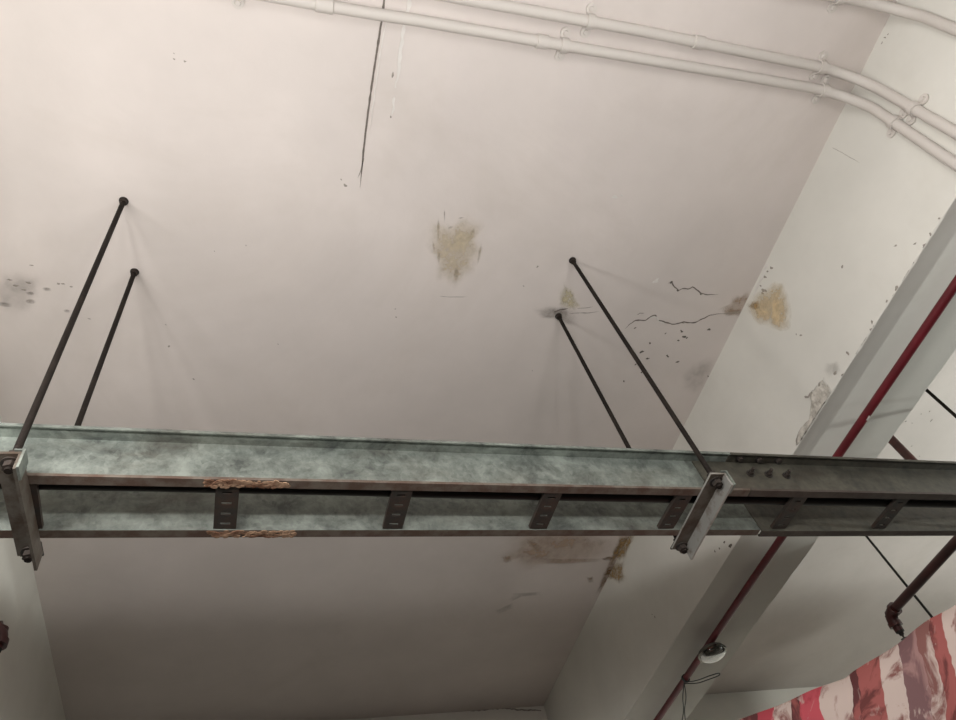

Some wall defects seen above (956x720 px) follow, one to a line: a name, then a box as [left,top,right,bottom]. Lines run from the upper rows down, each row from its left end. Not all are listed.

crack [358,0,386,185]
crack [625,278,737,329]
spalling [796,381,830,444]